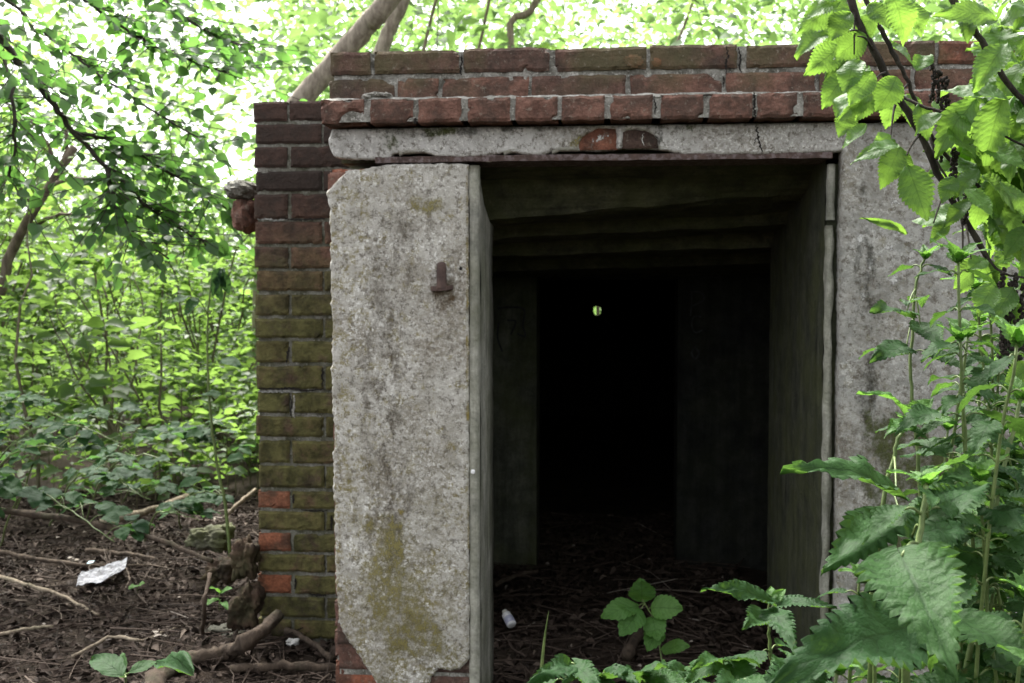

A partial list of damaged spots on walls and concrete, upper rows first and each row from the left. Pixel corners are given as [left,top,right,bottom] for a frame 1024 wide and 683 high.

crack [753,93,763,152]
spalling [337,620,376,683]